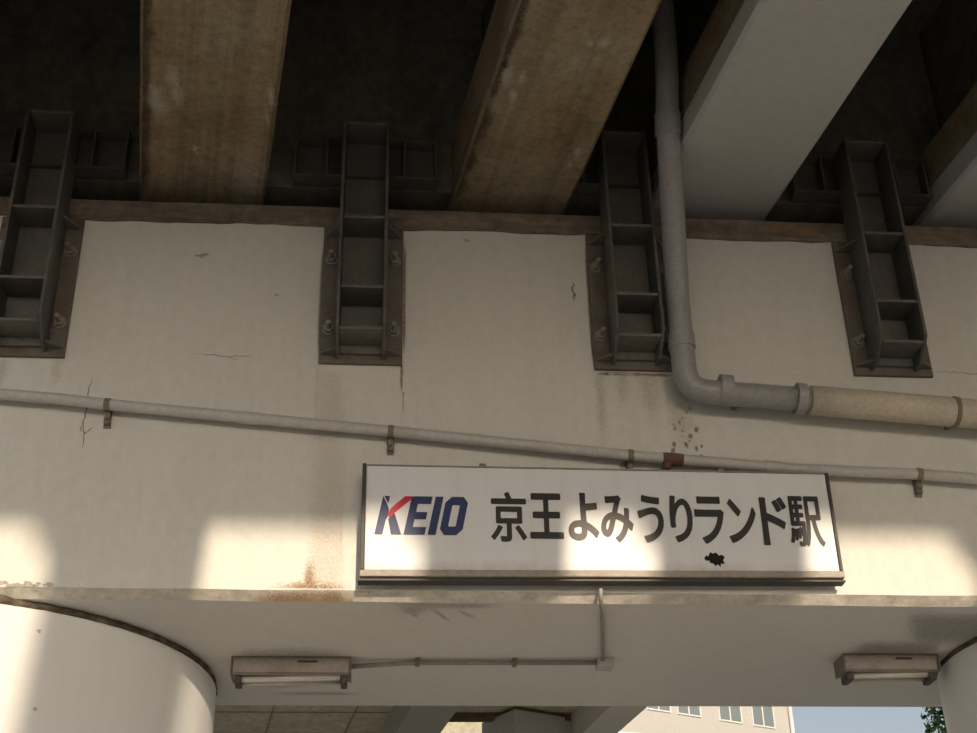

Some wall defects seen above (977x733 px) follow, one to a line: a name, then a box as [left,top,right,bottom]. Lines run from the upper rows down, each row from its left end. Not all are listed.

crack [80,379,93,448]
rust [254,560,364,602]